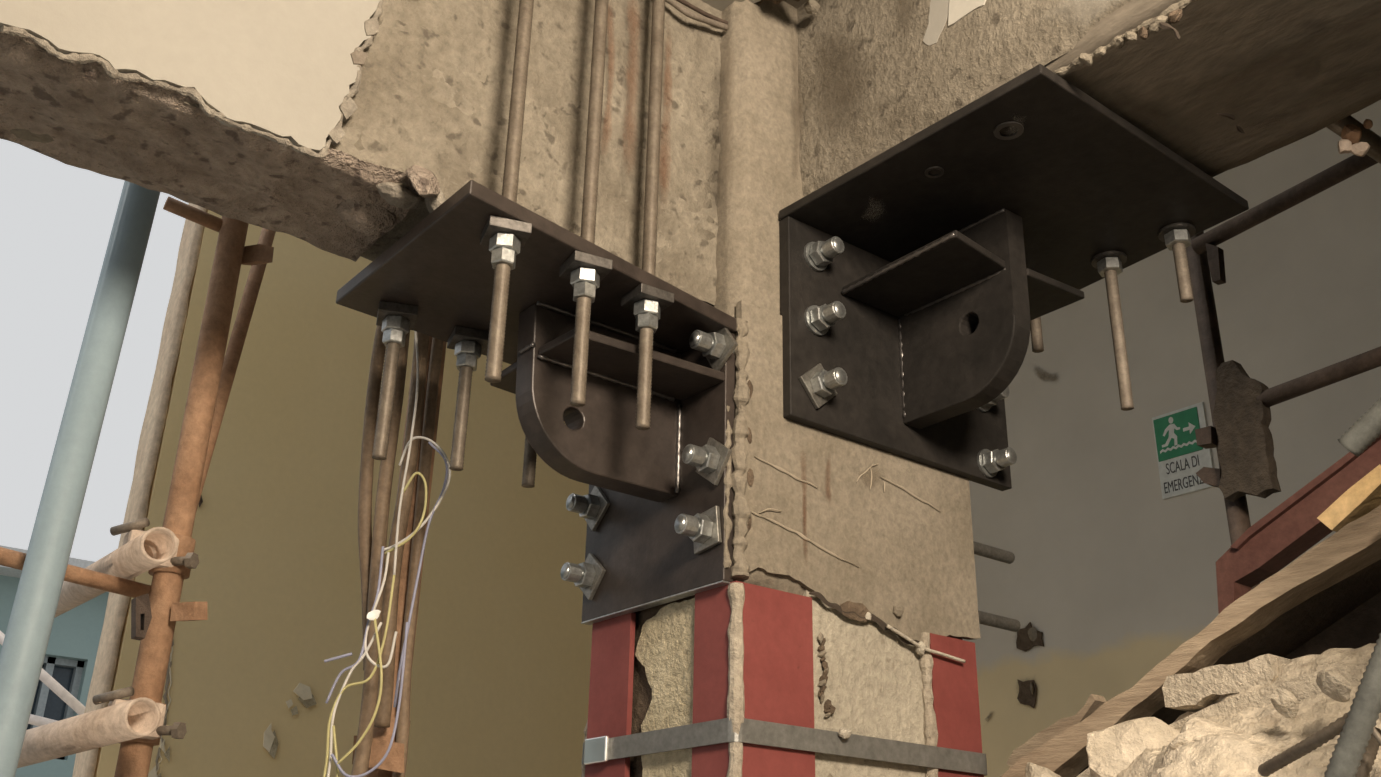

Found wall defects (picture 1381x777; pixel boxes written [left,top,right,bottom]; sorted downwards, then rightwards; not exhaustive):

flaking render [923,0,986,46]
spalling [1016,622,1044,652]
spalling [1017,679,1037,708]
spalling [1116,643,1377,777]
spalling [1355,713,1381,777]